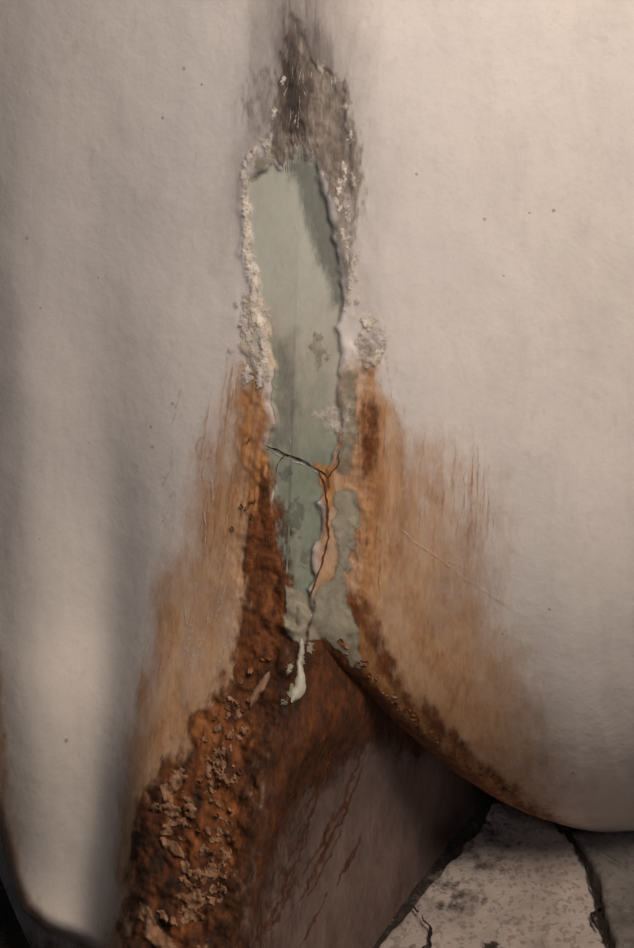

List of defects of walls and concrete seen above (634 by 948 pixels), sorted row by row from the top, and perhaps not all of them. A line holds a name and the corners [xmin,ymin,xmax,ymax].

rust [109,367,316,948]
crack [262,443,340,596]
peeling [229,12,390,613]
crack [400,904,433,948]
rust [314,366,563,824]
crack [554,823,614,948]